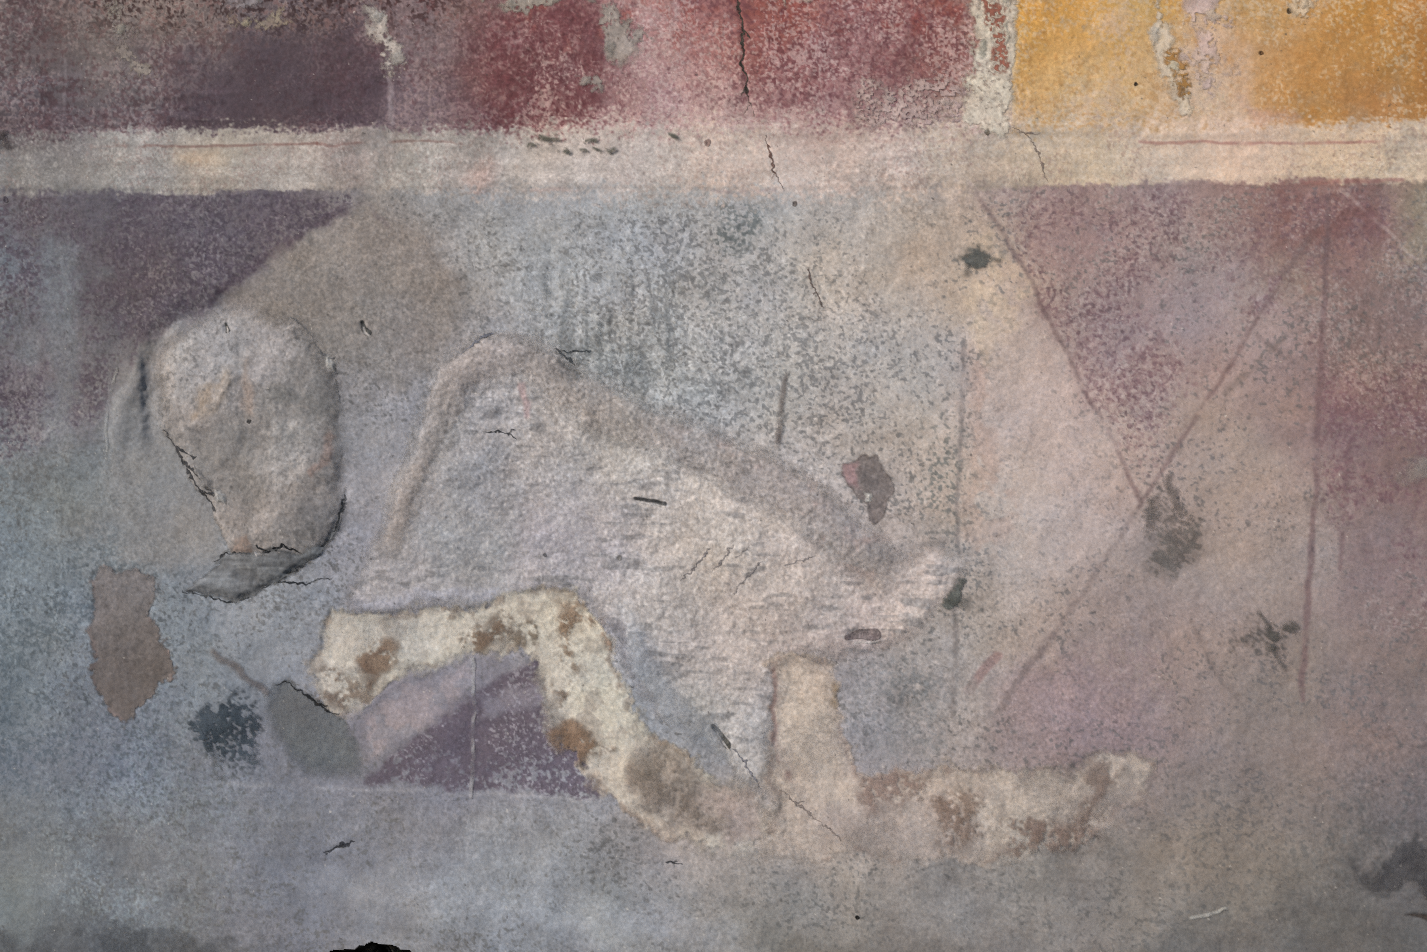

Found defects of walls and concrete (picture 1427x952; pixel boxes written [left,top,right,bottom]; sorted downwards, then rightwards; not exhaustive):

peeling [482,0,559,15]
peeling [589,0,651,66]
crack [736,0,781,184]
peeling [1148,0,1232,115]
crack [163,430,215,511]
spalling [841,454,894,524]
crack [183,494,346,603]
spalling [86,564,177,721]
water stain [188,650,268,765]
spalling [270,584,1154,866]